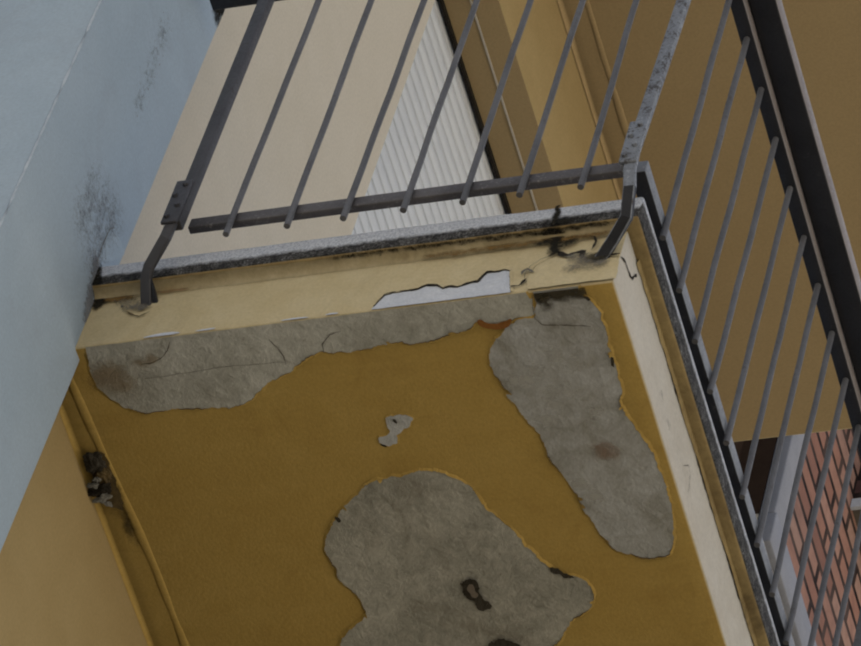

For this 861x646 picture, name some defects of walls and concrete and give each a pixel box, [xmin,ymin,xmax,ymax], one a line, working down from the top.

damp [80,194,116,322]
damp [333,205,610,259]
peeling [83,269,677,560]
peeling [322,467,596,646]